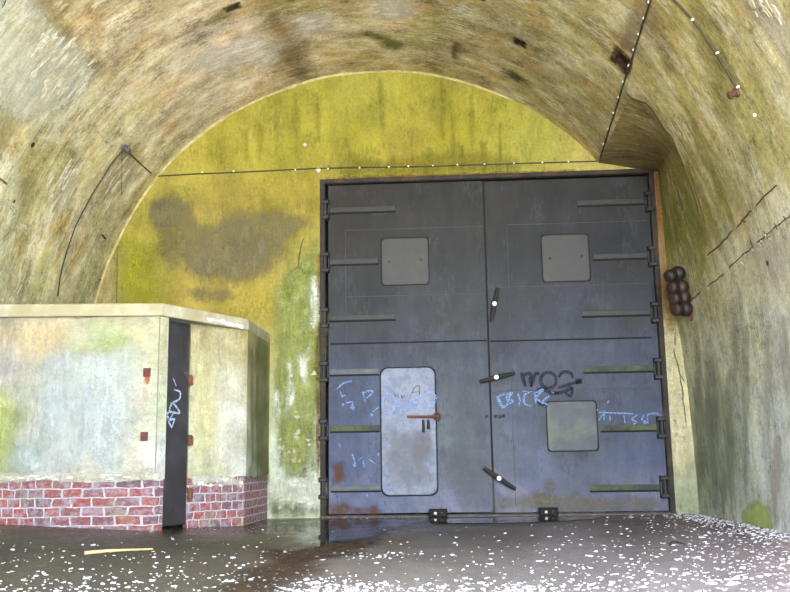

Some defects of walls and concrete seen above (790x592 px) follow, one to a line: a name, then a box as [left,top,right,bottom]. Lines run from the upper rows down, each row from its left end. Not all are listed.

water stain [150,195,306,282]
crack [625,93,790,301]
water stain [279,336,288,429]
water stain [302,261,317,406]